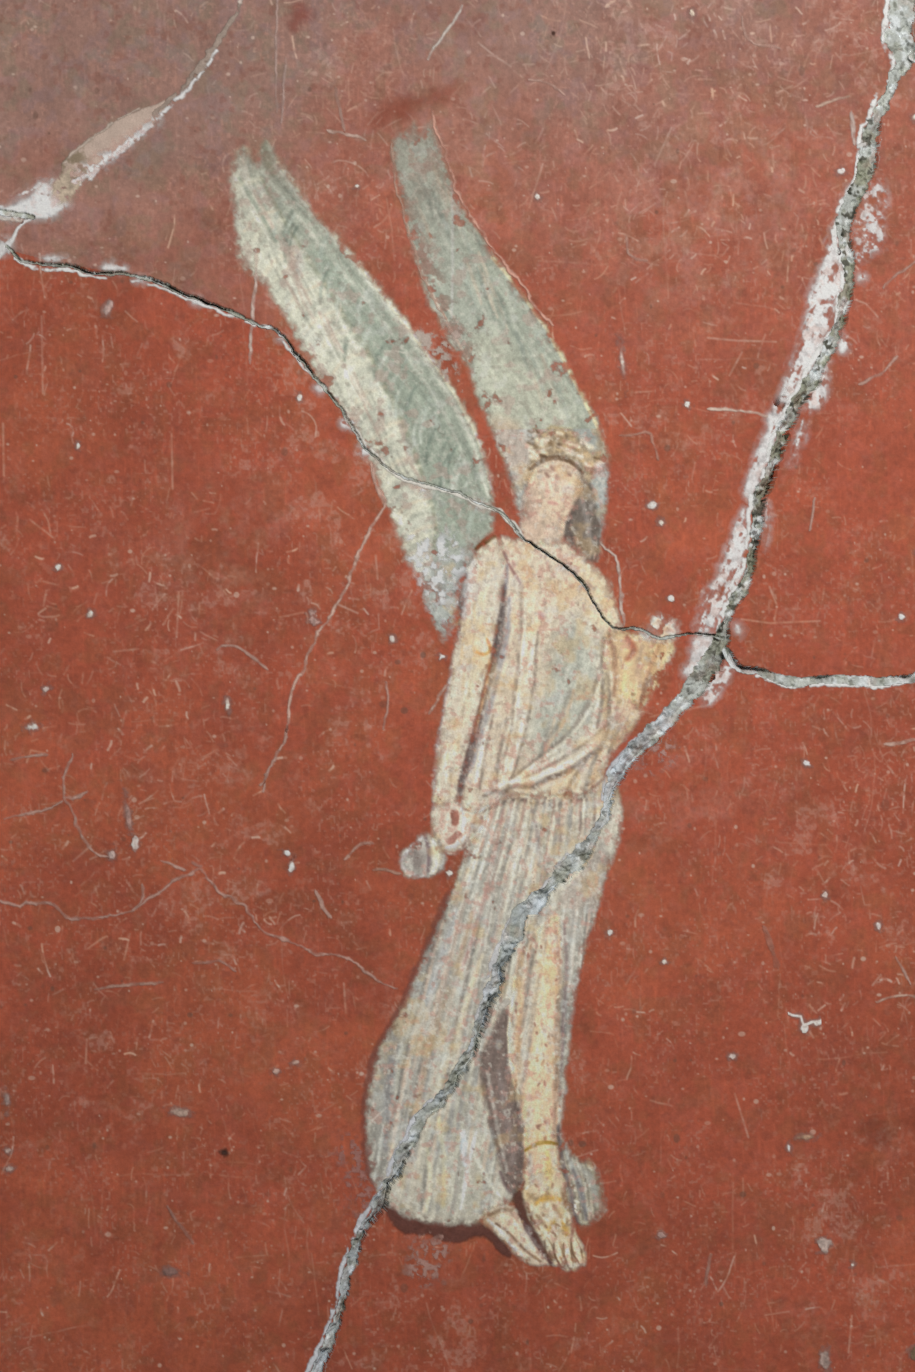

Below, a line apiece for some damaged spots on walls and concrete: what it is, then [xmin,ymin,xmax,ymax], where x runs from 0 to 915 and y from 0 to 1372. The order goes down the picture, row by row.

crack [0,0,715,640]
crack [287,655,308,718]
crack [305,0,915,1372]
crack [19,753,109,857]
crack [260,732,287,792]
crack [0,871,395,989]